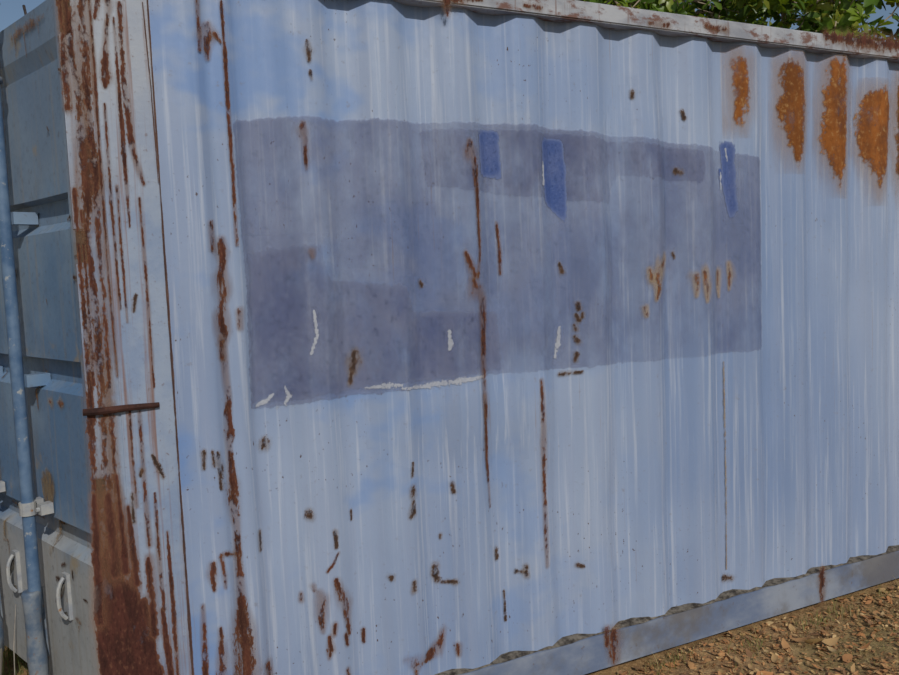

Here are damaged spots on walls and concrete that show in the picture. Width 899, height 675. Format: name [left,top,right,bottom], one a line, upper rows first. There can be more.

corrosion [731,56,751,126]
corrosion [775,57,806,163]
corrosion [817,30,899,189]
corrosion [648,261,664,300]
corrosion [694,264,731,300]
corrosion [56,0,272,675]
corrosion [318,552,351,658]
corrosion [411,629,444,675]